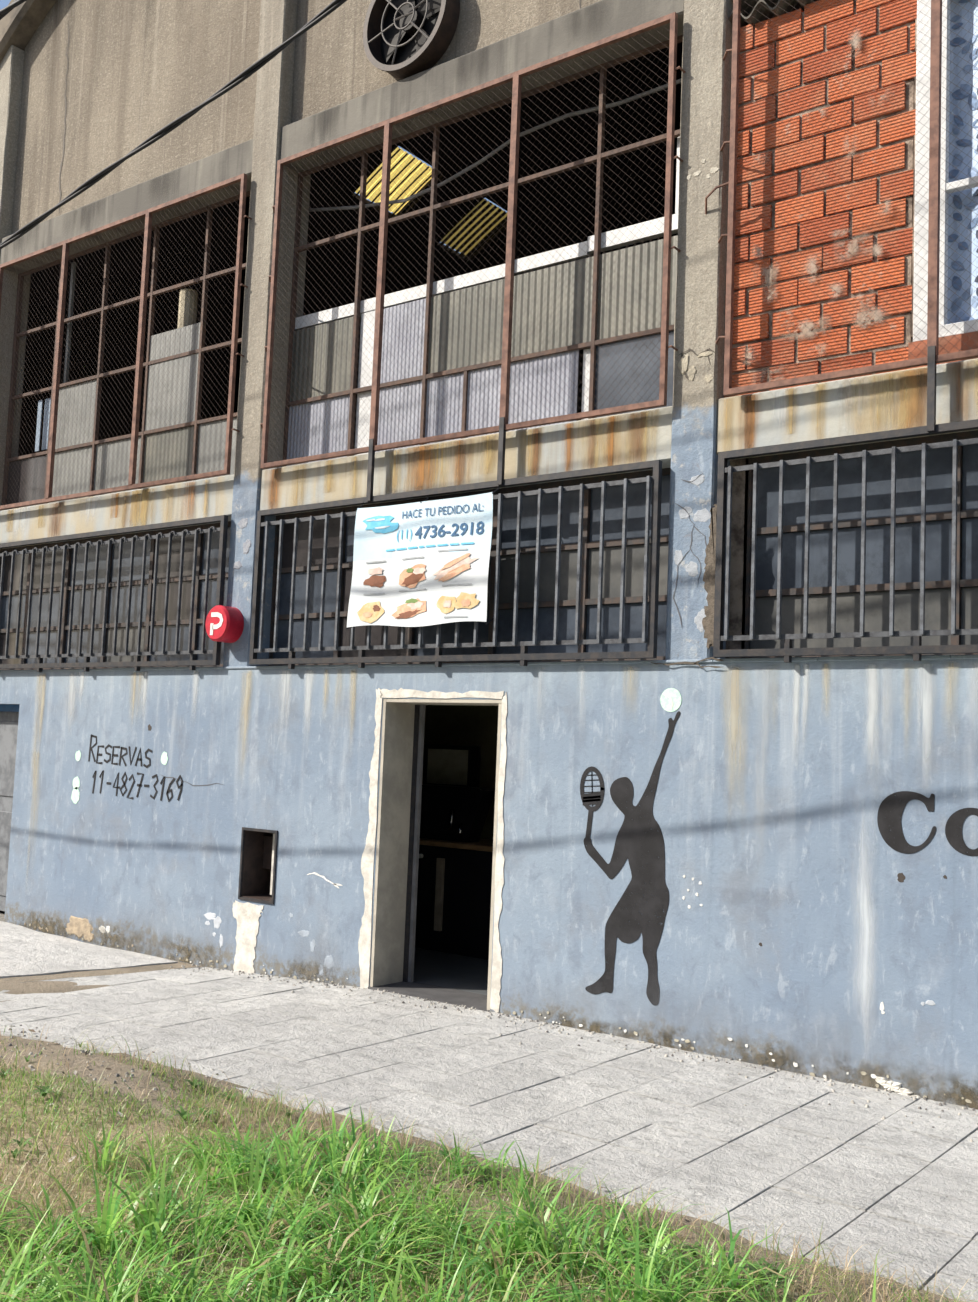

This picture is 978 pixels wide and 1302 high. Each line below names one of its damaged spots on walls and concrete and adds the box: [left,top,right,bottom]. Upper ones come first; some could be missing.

spalling [678,351,715,383]
rust [956,362,968,415]
rust [528,428,539,475]
rust [589,416,614,468]
rust [745,395,755,448]
spalling [674,504,717,649]
leakage [28,918,68,937]
flaking render [168,688,978,1142]
leakage [560,1019,605,1034]
peeling [0,1019,170,1094]
leakage [834,1067,885,1089]
leakage [935,1082,978,1110]